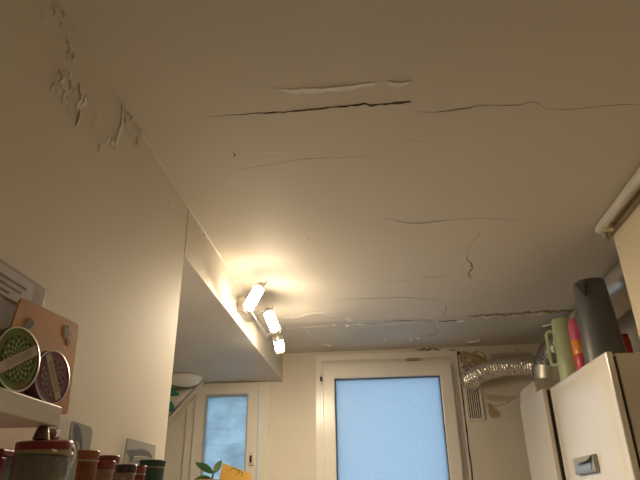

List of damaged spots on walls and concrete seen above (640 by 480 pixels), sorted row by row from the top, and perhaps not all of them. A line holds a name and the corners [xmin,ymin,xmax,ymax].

crack [204,101,411,118]
crack [432,101,634,113]
crack [284,297,574,480]